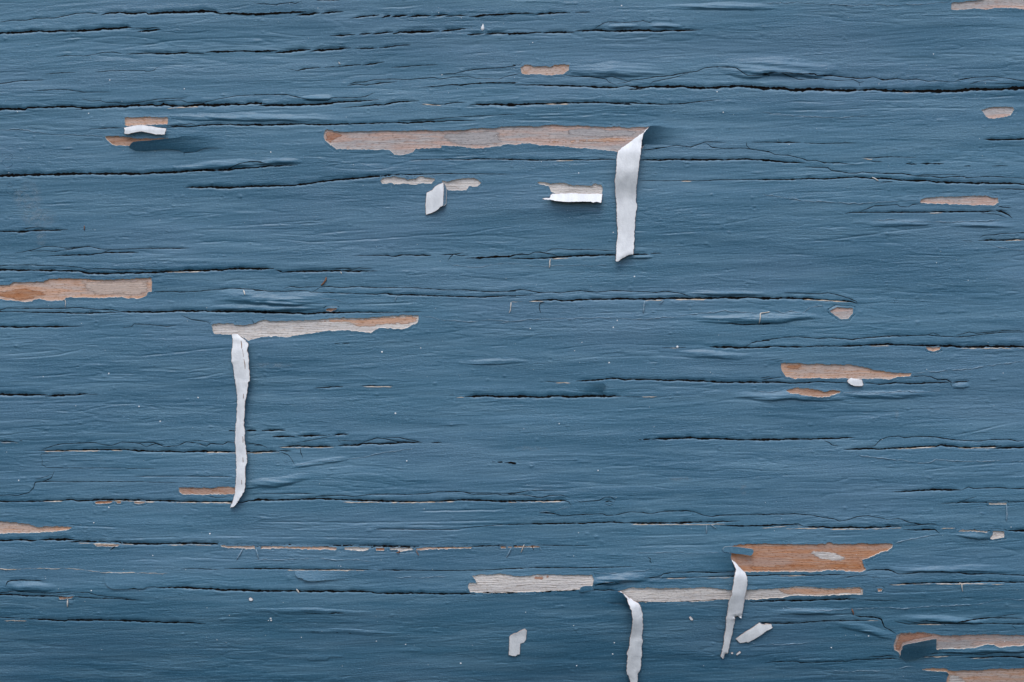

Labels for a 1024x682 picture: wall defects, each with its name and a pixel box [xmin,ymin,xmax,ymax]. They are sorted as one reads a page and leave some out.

crack [0,0,1024,129]
crack [0,152,613,189]
peeling [321,121,700,262]
crack [639,138,1024,241]
peeling [0,275,155,305]
crack [0,227,1024,349]
peeling [176,306,422,508]
crack [457,376,967,398]
peeling [778,360,914,400]
crack [0,429,1024,663]
peeling [465,539,895,682]
peeling [891,629,1024,682]